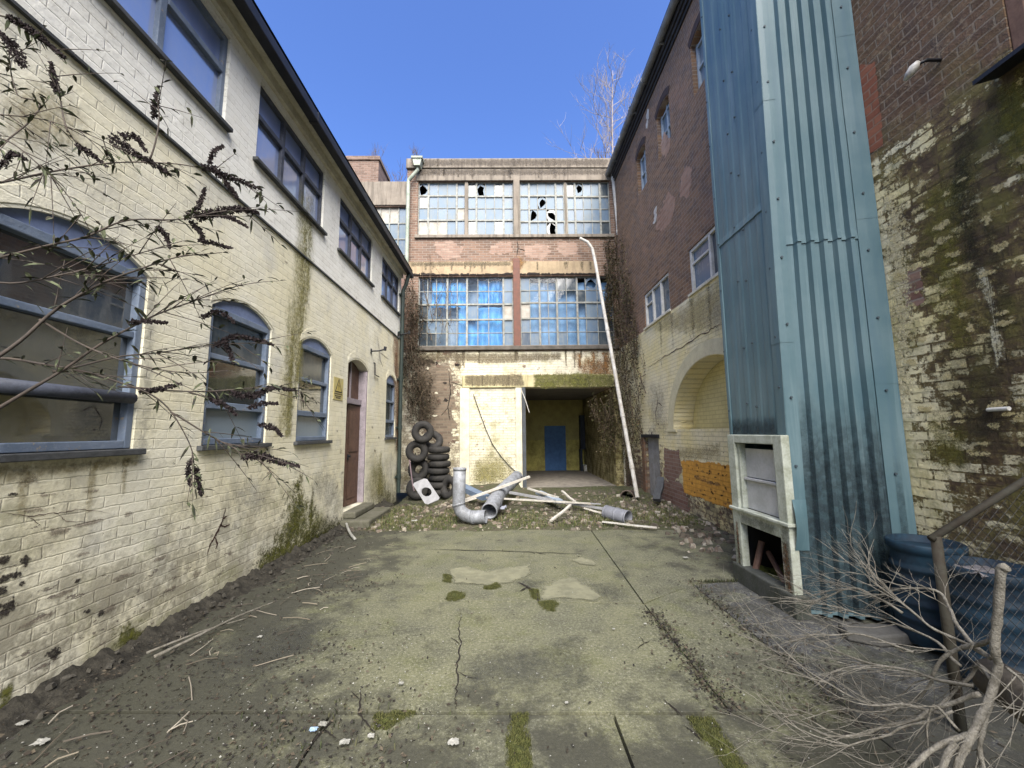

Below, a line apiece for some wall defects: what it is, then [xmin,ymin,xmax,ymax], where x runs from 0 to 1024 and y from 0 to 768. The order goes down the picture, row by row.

water stain [285,249,310,435]
water stain [418,350,582,386]
peeling [661,448,733,512]
peeling [879,156,996,414]
peeling [918,362,974,440]
peeling [966,441,991,457]
water stain [977,267,1005,365]
peeling [994,310,1014,327]
peeling [987,398,1024,430]
crack [452,618,478,708]